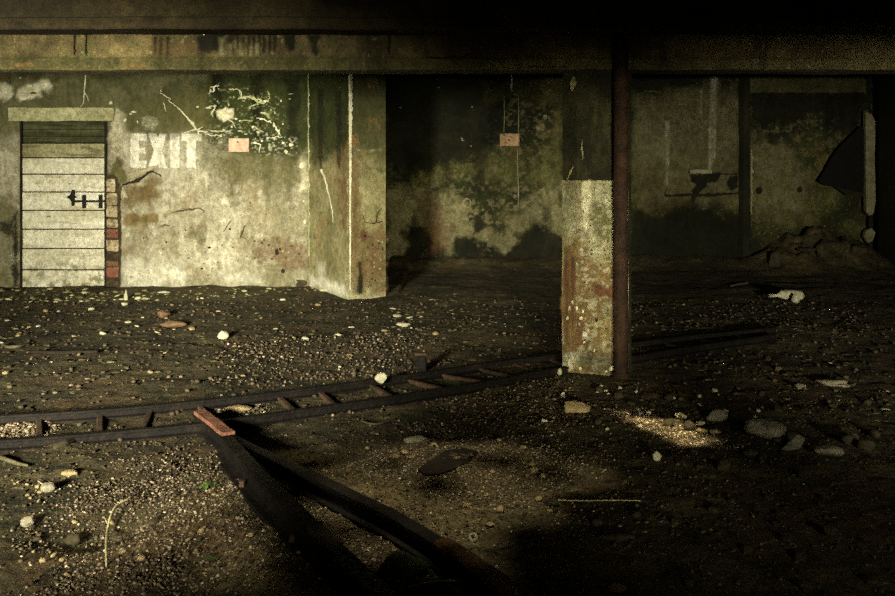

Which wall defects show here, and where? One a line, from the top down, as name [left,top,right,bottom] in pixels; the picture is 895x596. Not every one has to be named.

damp [197,34,294,56]
damp [127,74,351,188]
peeling [197,85,293,154]
damp [386,74,563,192]
crack [119,170,161,202]
flaking render [246,74,310,273]
crack [160,207,204,227]
damp [401,217,430,257]
damp [454,213,485,257]
damp [502,209,562,259]
corrosion [561,238,613,353]